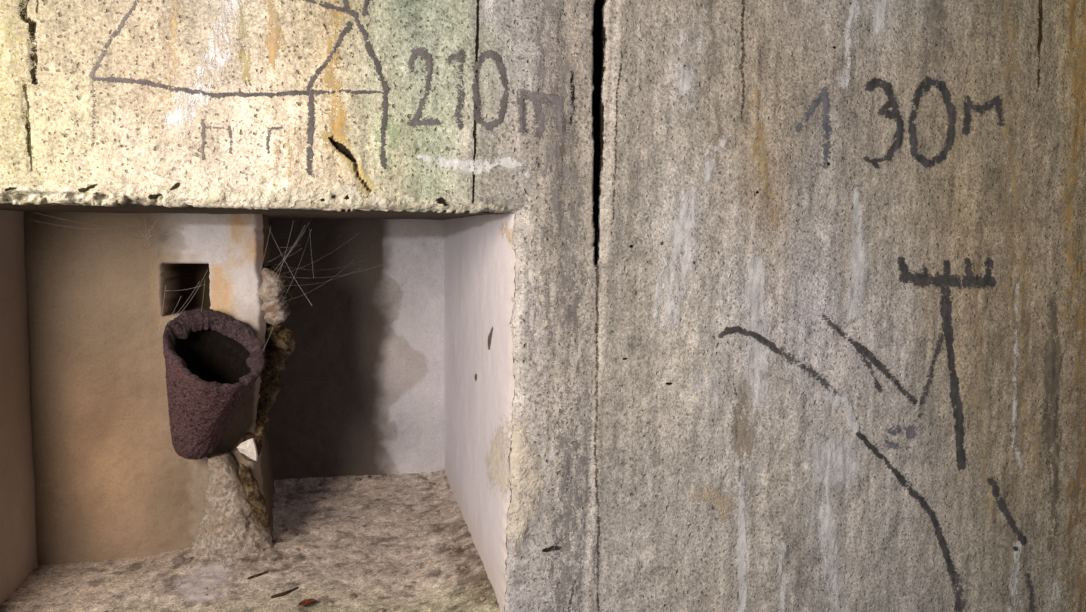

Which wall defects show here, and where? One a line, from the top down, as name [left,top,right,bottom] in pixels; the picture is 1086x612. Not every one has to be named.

crack [17,0,39,172]
rust [272,119,309,190]
rust [314,0,352,153]
crack [561,0,623,612]
water stain [652,0,729,353]
water stain [686,254,776,612]
water stain [797,389,866,612]
water stain [842,185,871,322]
water stain [837,0,899,91]
water stain [1011,284,1022,469]
crack [1036,0,1044,88]
water stain [1038,296,1064,556]